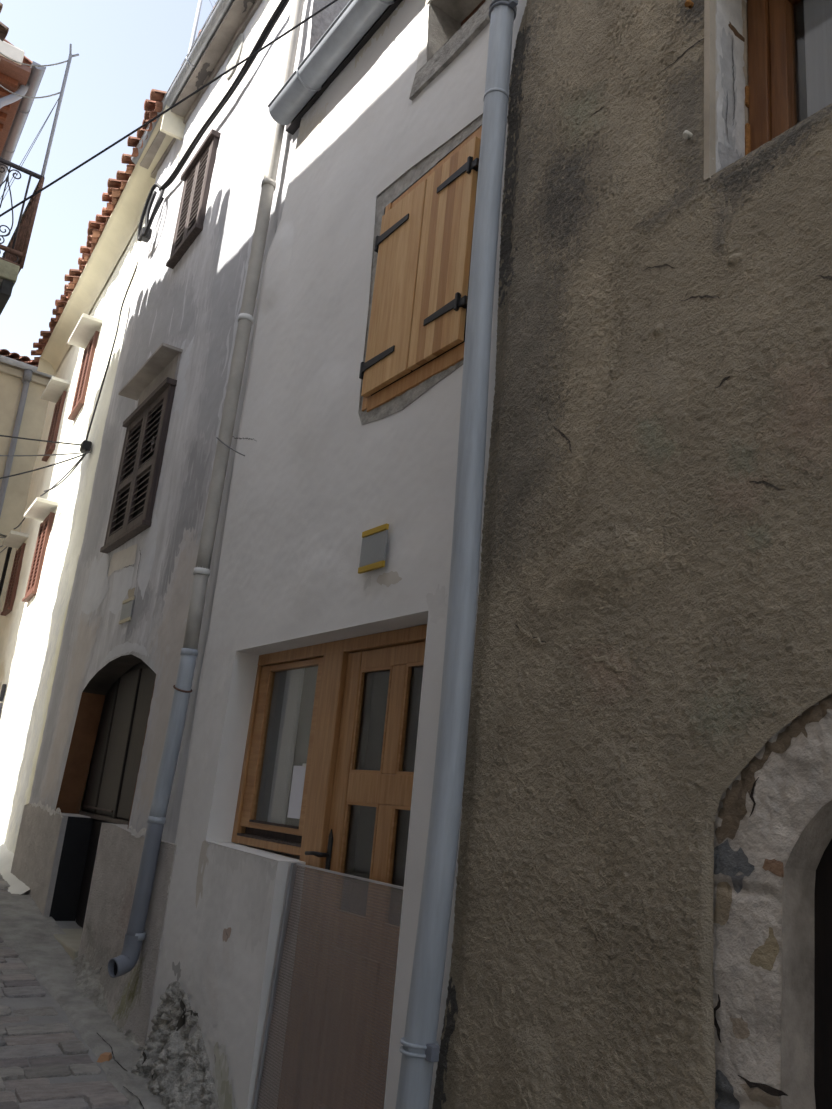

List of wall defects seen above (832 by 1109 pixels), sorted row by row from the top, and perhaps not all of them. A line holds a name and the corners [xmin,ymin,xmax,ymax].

damp [627,0,832,259]
damp [478,0,631,610]
spalling [749,927,780,971]
spalling [740,1084,780,1108]